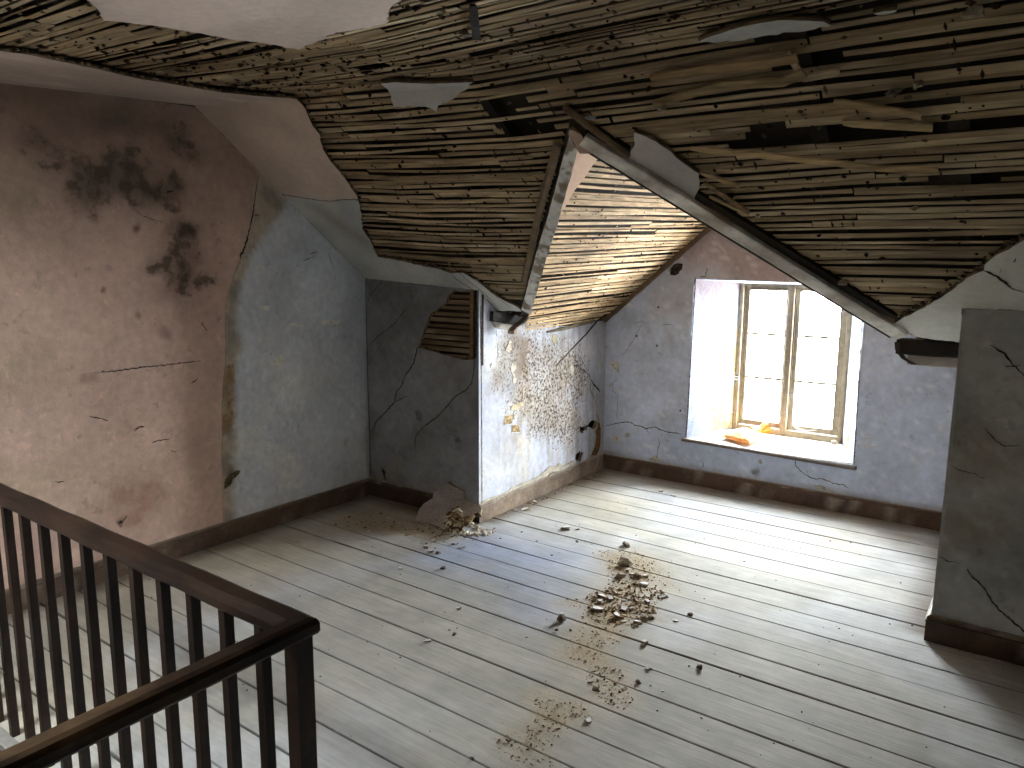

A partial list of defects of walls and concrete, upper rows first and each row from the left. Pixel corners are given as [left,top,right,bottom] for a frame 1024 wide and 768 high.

water stain [0,95,229,306]
crack [235,176,358,272]
spalling [0,0,1024,366]
crack [983,258,1024,293]
crack [86,360,200,384]
crack [366,280,418,475]
flaking render [505,340,517,383]
peeling [504,402,526,433]
crack [574,270,707,454]
crack [795,322,863,489]
crack [990,345,1024,376]
crack [939,556,1024,632]